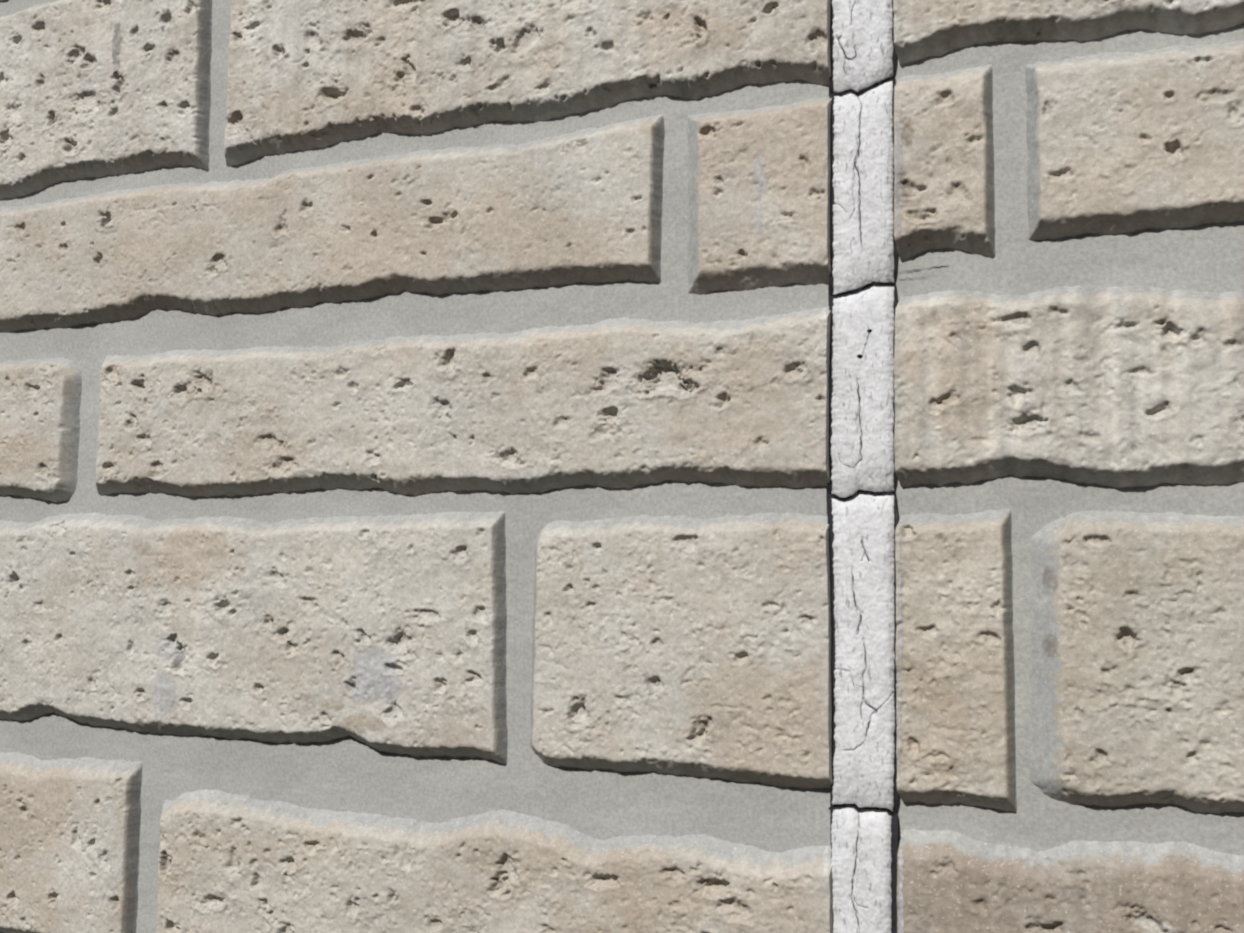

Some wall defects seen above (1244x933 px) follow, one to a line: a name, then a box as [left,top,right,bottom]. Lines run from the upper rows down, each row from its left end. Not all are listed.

crack [827,0,898,933]